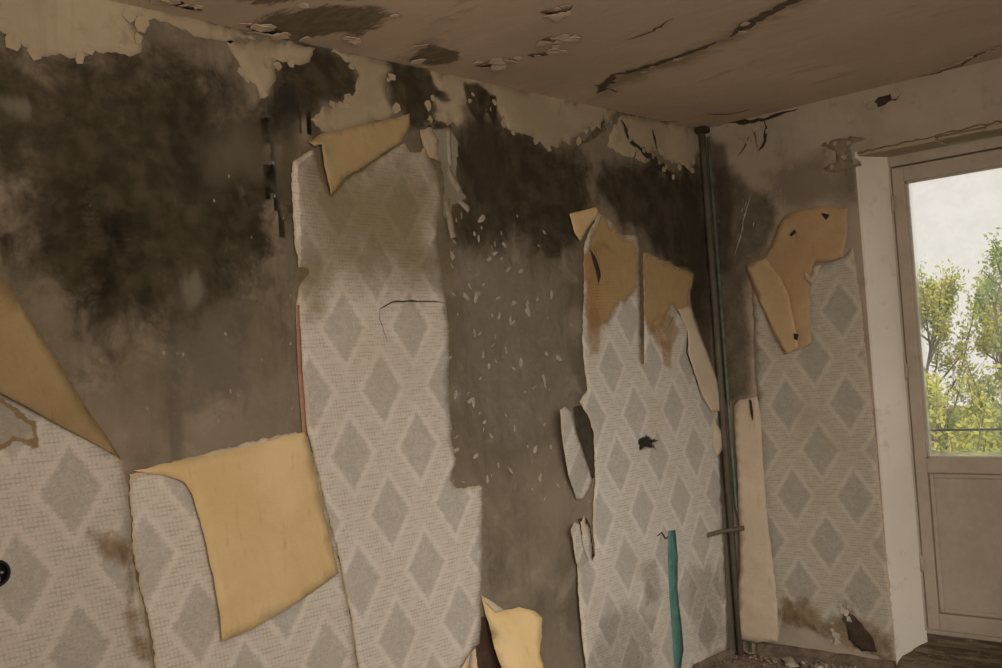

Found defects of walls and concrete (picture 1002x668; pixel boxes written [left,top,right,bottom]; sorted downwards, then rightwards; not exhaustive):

water stain [0,399,39,449]
peeling [0,275,120,458]
water stain [0,44,355,325]
peeling [0,0,410,194]
water stain [389,61,447,127]
peeling [471,33,583,71]
peeling [404,44,700,173]
water stain [444,83,774,401]
crack [579,0,802,190]
peeling [745,206,848,354]
peeling [133,432,339,641]
water stain [783,600,890,652]